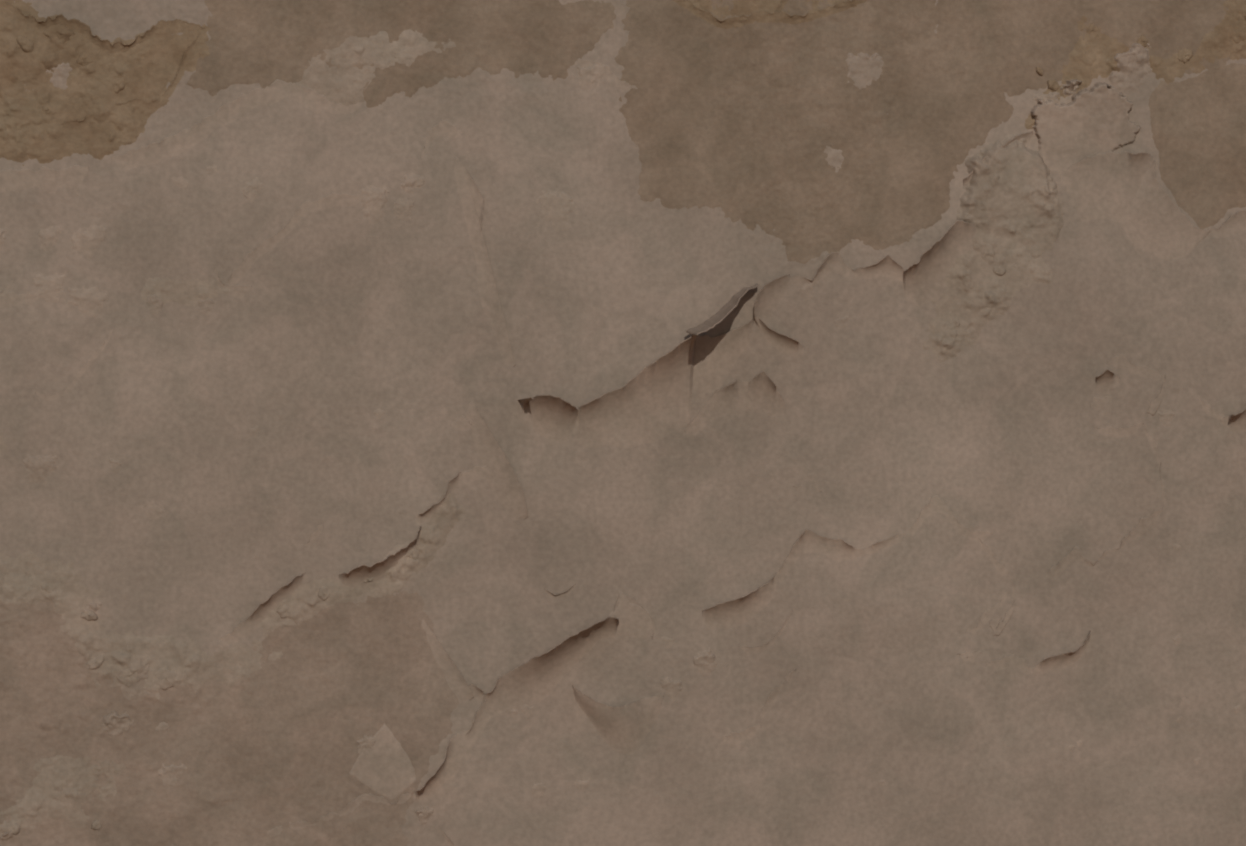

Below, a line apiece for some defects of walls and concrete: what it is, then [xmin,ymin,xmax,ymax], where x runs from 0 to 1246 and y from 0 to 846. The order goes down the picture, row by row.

flaking render [0,0,1246,449]
peeling [218,572,305,651]
peeling [339,472,461,596]
peeling [482,591,664,755]
peeling [702,529,905,630]
peeling [1032,630,1091,675]